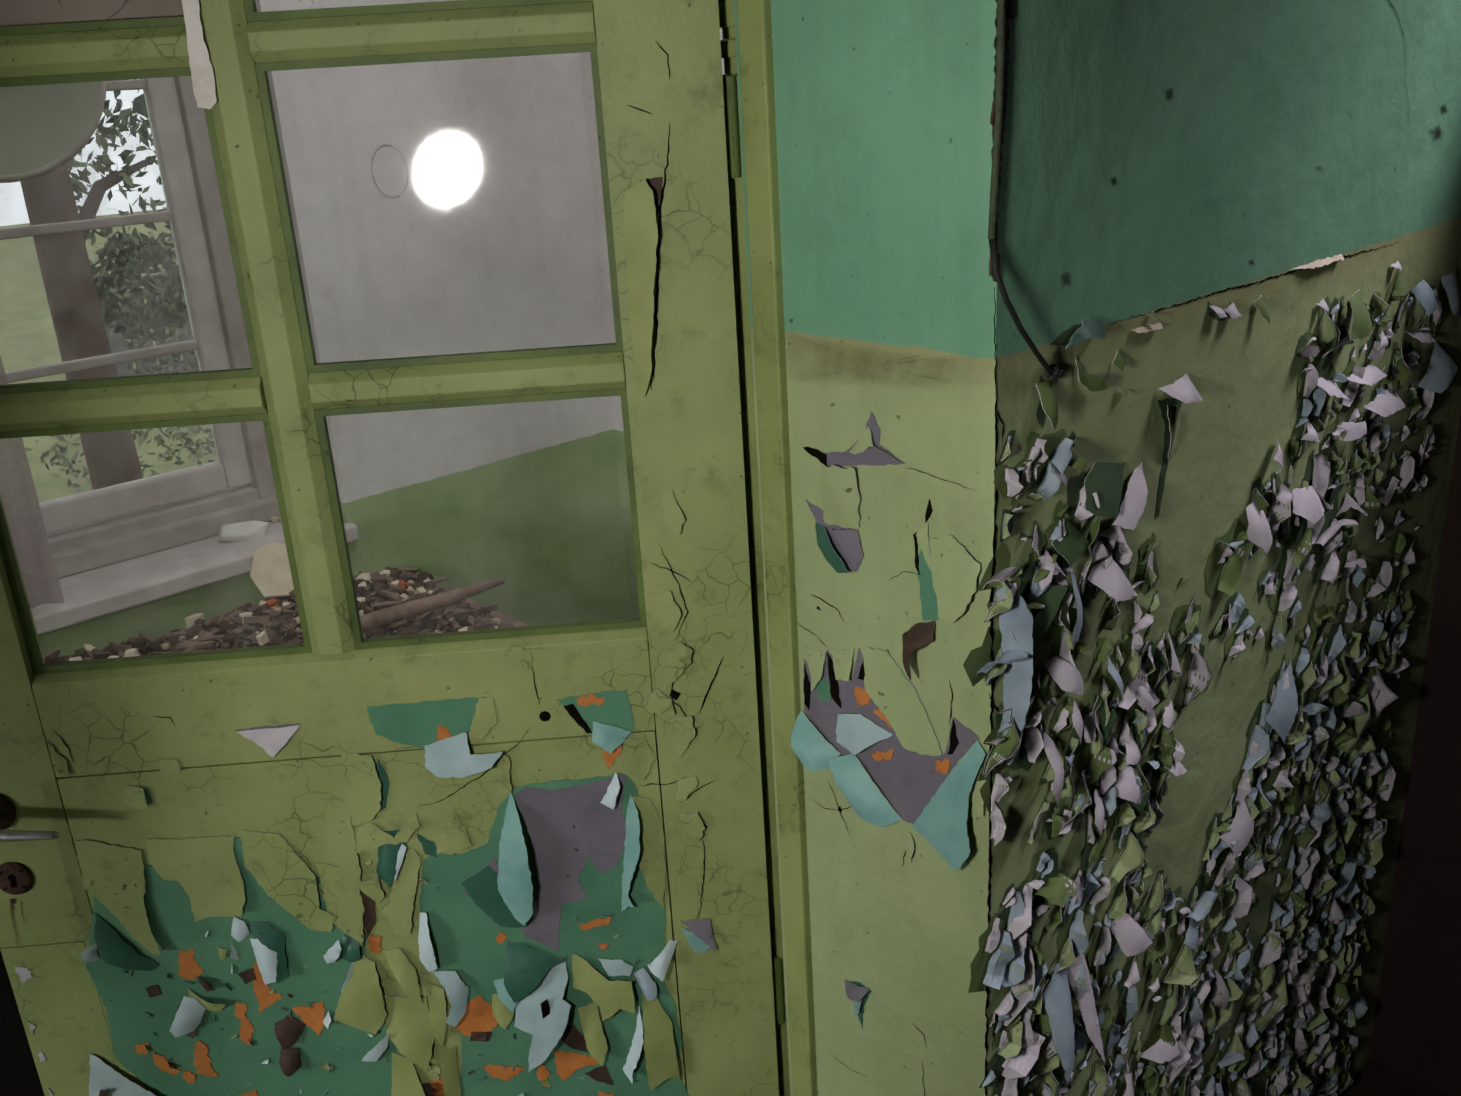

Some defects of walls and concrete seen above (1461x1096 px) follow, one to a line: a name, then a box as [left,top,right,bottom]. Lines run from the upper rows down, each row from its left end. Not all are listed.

peeling [15,966,33,984]
peeling [74,667,716,1096]
peeling [791,242,1461,1096]